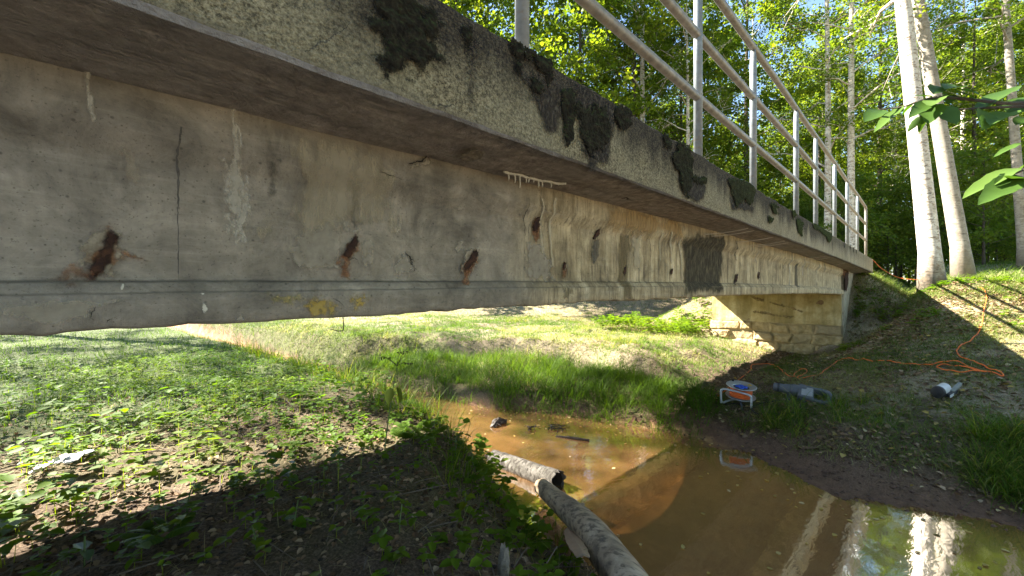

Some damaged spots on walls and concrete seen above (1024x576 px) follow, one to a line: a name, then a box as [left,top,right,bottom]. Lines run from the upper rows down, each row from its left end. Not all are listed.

leakage [521,69,615,171]
crack [175,126,183,276]
leakage [659,232,738,294]